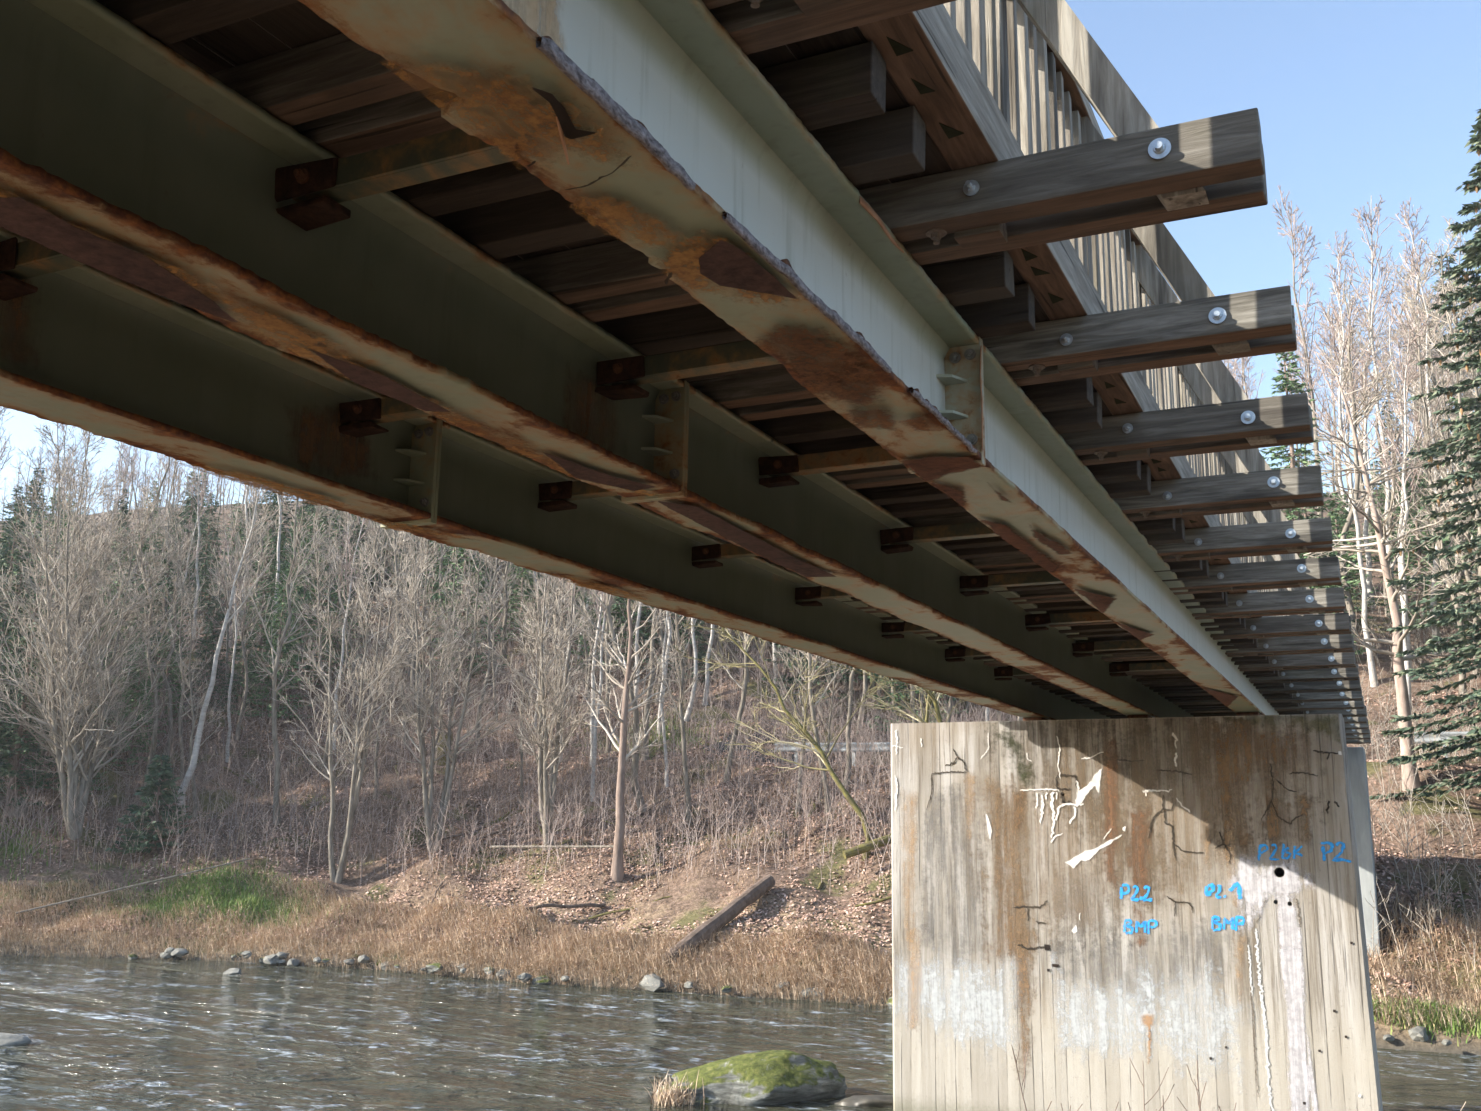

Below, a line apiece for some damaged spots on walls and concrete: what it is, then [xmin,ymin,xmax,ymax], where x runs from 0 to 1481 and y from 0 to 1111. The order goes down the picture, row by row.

corrosion [381,0,696,191]
corrosion [151,259,361,379]
corrosion [571,196,981,508]
corrosion [421,396,571,475]
corrosion [180,463,344,506]
corrosion [358,515,469,539]
corrosion [542,571,646,600]
corrosion [980,520,1071,572]
crack [1117,759,1231,864]
crack [1261,750,1339,825]
crack [1167,896,1194,916]
leakage [1058,857,1318,1111]